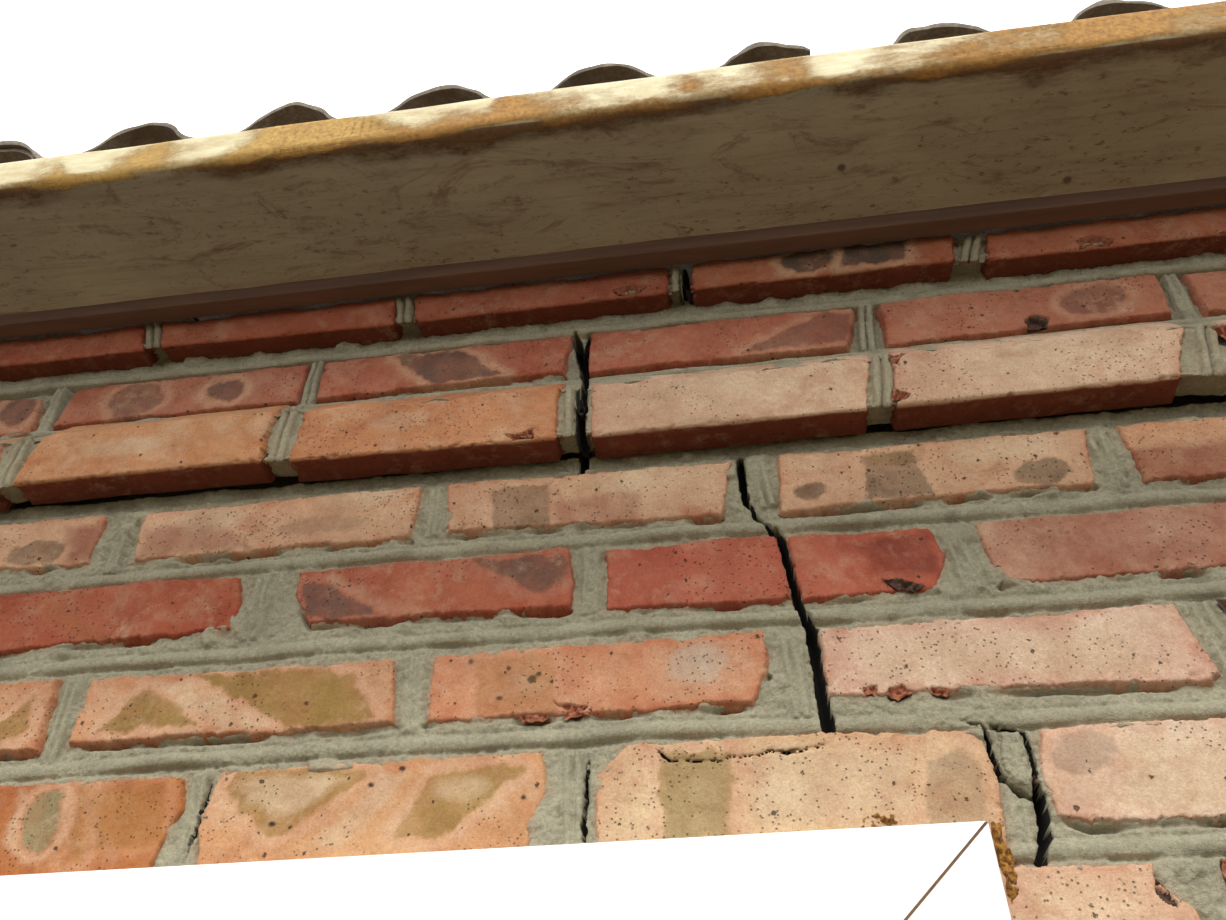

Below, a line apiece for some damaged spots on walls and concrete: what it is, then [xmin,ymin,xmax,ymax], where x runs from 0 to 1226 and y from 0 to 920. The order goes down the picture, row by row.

crack [574,339,591,474]
crack [660,457,835,763]
spalling [520,702,589,724]
spalling [863,684,912,701]
spalling [930,687,950,697]
crack [983,729,1051,867]